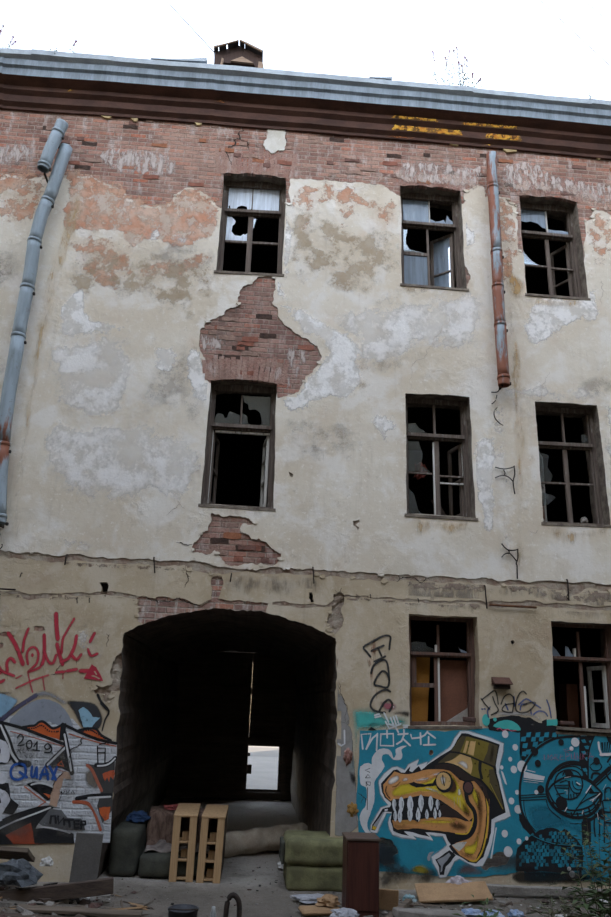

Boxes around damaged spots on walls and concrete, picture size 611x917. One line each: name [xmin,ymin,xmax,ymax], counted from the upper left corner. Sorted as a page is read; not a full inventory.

flaking render [0,109,611,290]
water stain [107,256,208,303]
water stain [294,215,383,290]
flaking render [187,267,480,410]
crack [135,570,207,606]
flaking render [0,513,611,635]
flaking render [90,653,122,703]